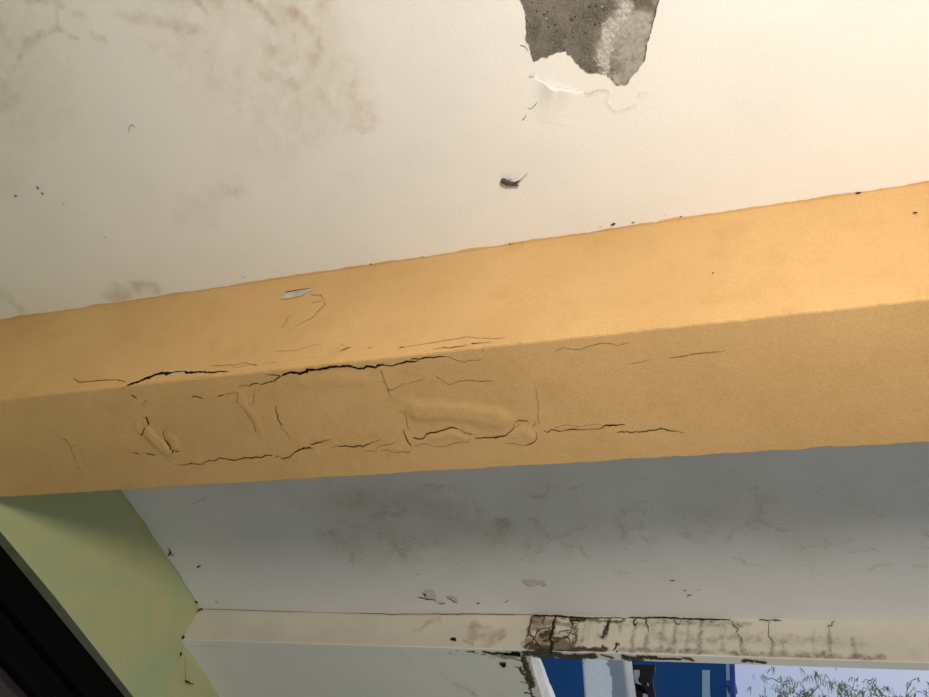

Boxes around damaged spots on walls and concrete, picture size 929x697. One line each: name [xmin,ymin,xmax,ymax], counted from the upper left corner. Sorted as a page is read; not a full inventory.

flaking render [520,0,659,127]
peeling [281,287,314,299]
crack [75,336,682,466]
peeling [419,589,458,605]
crack [429,603,781,653]